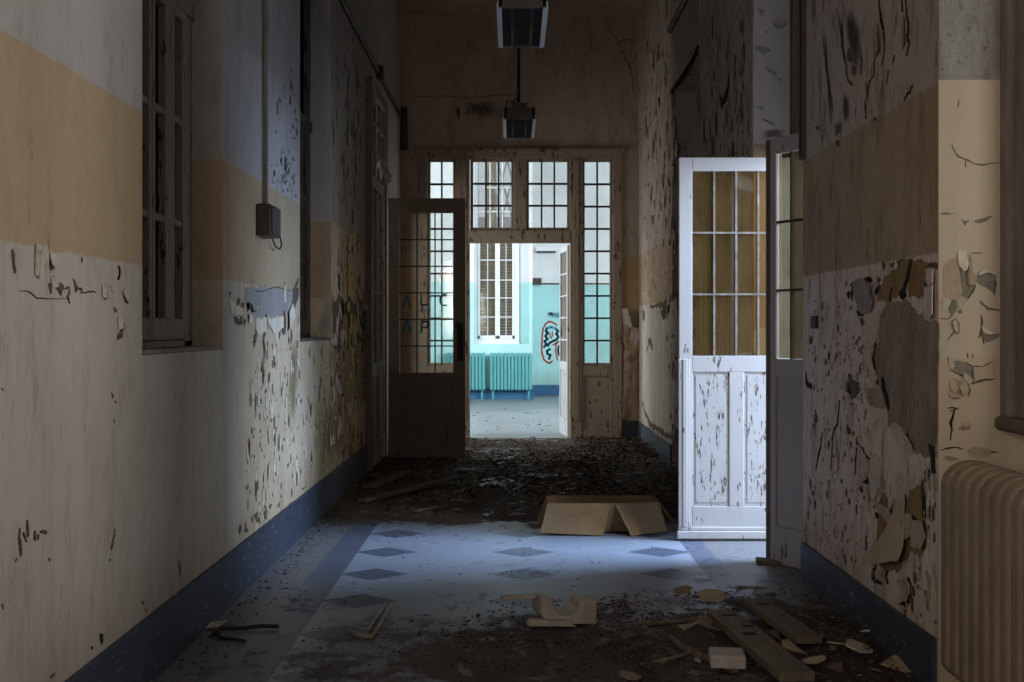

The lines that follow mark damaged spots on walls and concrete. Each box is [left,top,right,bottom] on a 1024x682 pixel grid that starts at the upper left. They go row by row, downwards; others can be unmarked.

crack [864,0,910,119]
peeling [35,244,83,297]
peeling [271,69,298,199]
peeling [642,0,782,442]
crack [952,145,1000,168]
peeling [229,223,368,534]
peeling [806,250,1000,635]